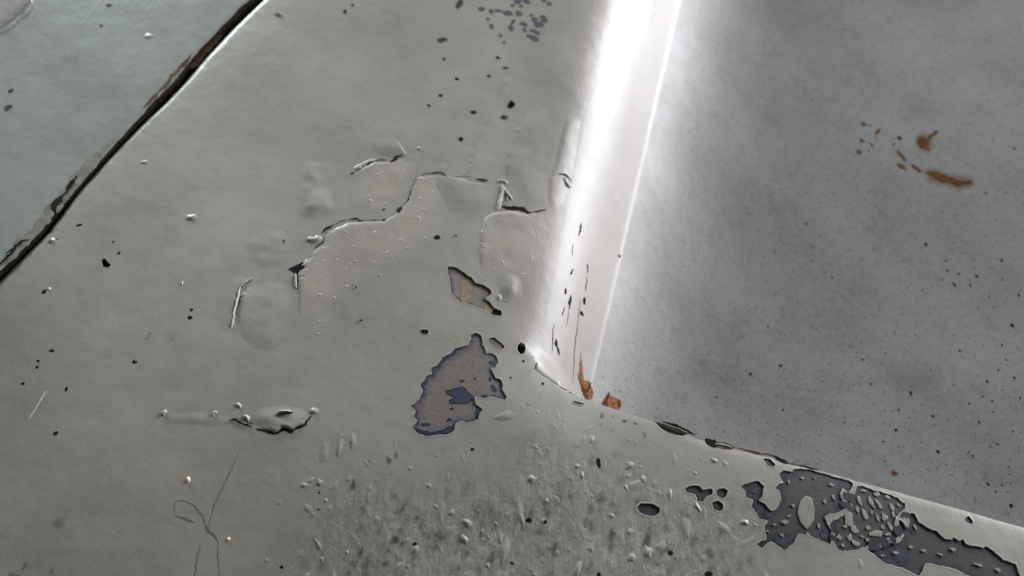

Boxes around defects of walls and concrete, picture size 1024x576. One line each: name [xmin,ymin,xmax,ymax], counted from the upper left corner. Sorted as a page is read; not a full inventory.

peeling [478,0,552,44]
corrosion [917,130,938,150]
corrosion [892,143,973,187]
crack [51,175,77,214]
crack [0,239,31,264]
peeling [445,265,504,318]
peeling [409,331,512,439]
corrosion [578,358,621,410]
crack [174,402,312,575]
peeling [635,501,662,518]
peeling [683,457,1022,576]